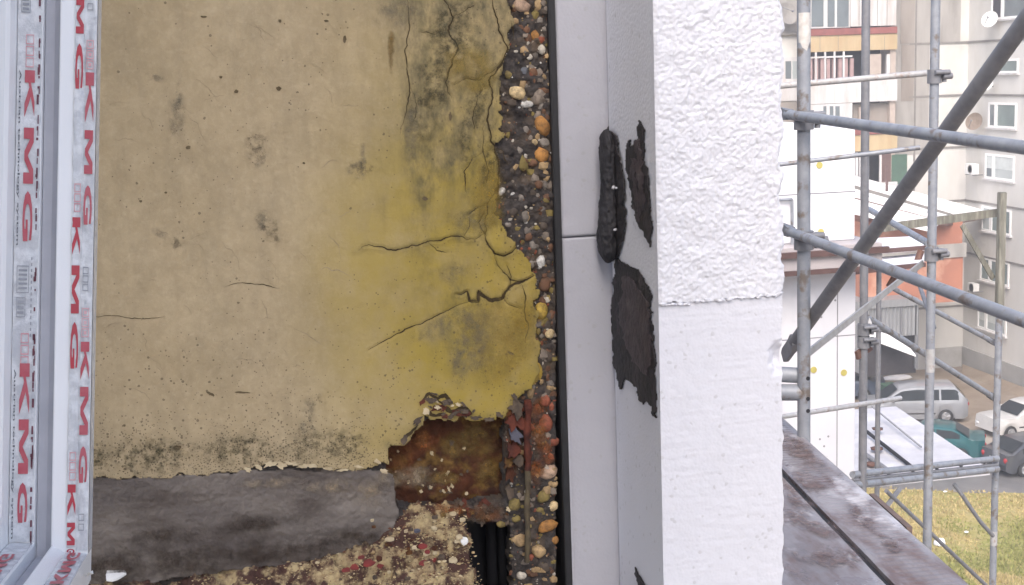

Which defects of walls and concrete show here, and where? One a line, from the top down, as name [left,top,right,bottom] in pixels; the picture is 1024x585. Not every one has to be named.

spalling [244,0,559,585]
crack [361,0,534,349]